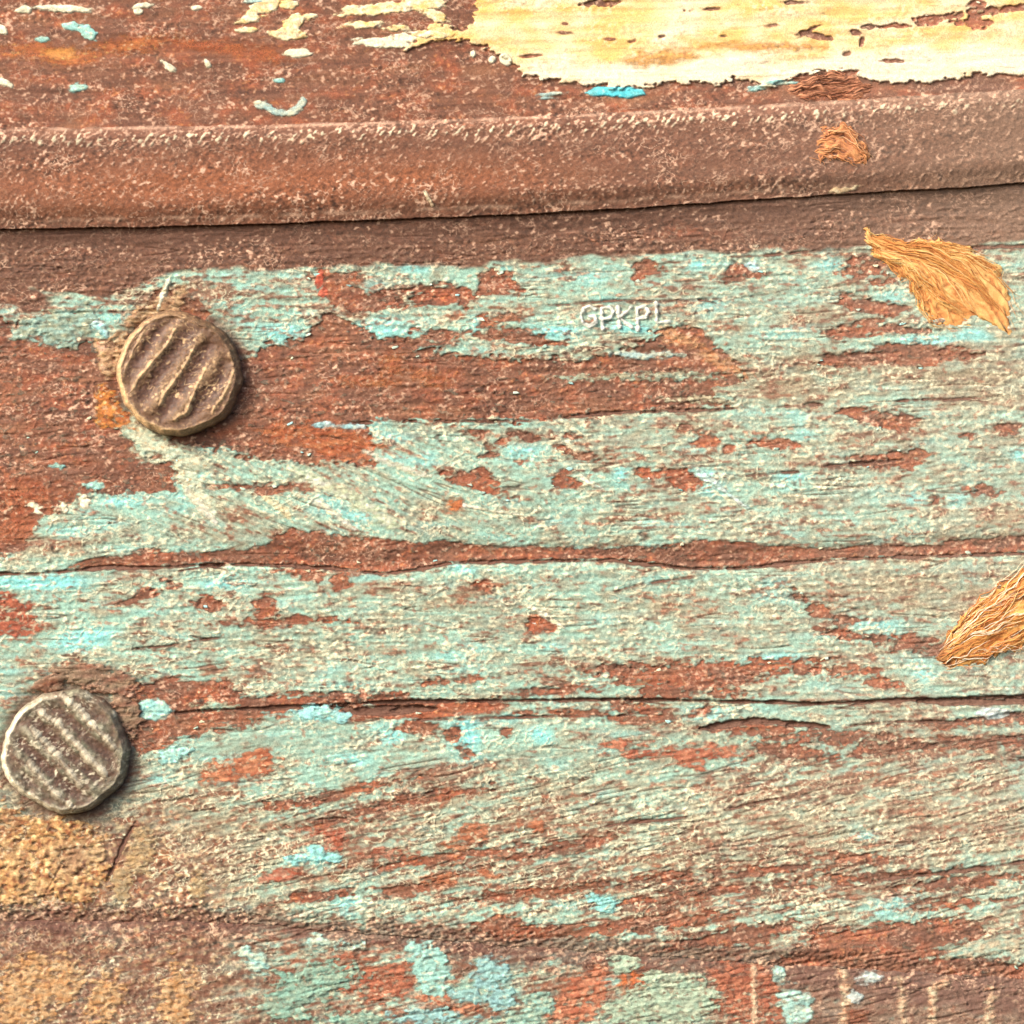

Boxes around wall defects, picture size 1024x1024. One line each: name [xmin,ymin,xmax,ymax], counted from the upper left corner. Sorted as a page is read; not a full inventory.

peeling [0,0,1024,129]
peeling [817,254,986,370]
peeling [0,300,182,558]
peeling [171,268,746,501]
peeling [189,592,360,630]
crack [0,552,1024,592]
peeling [68,527,1024,607]
peeling [792,587,944,657]
peeling [20,655,1024,767]
crack [175,694,1024,764]
peeling [234,932,556,1024]
peeling [470,850,1024,1024]